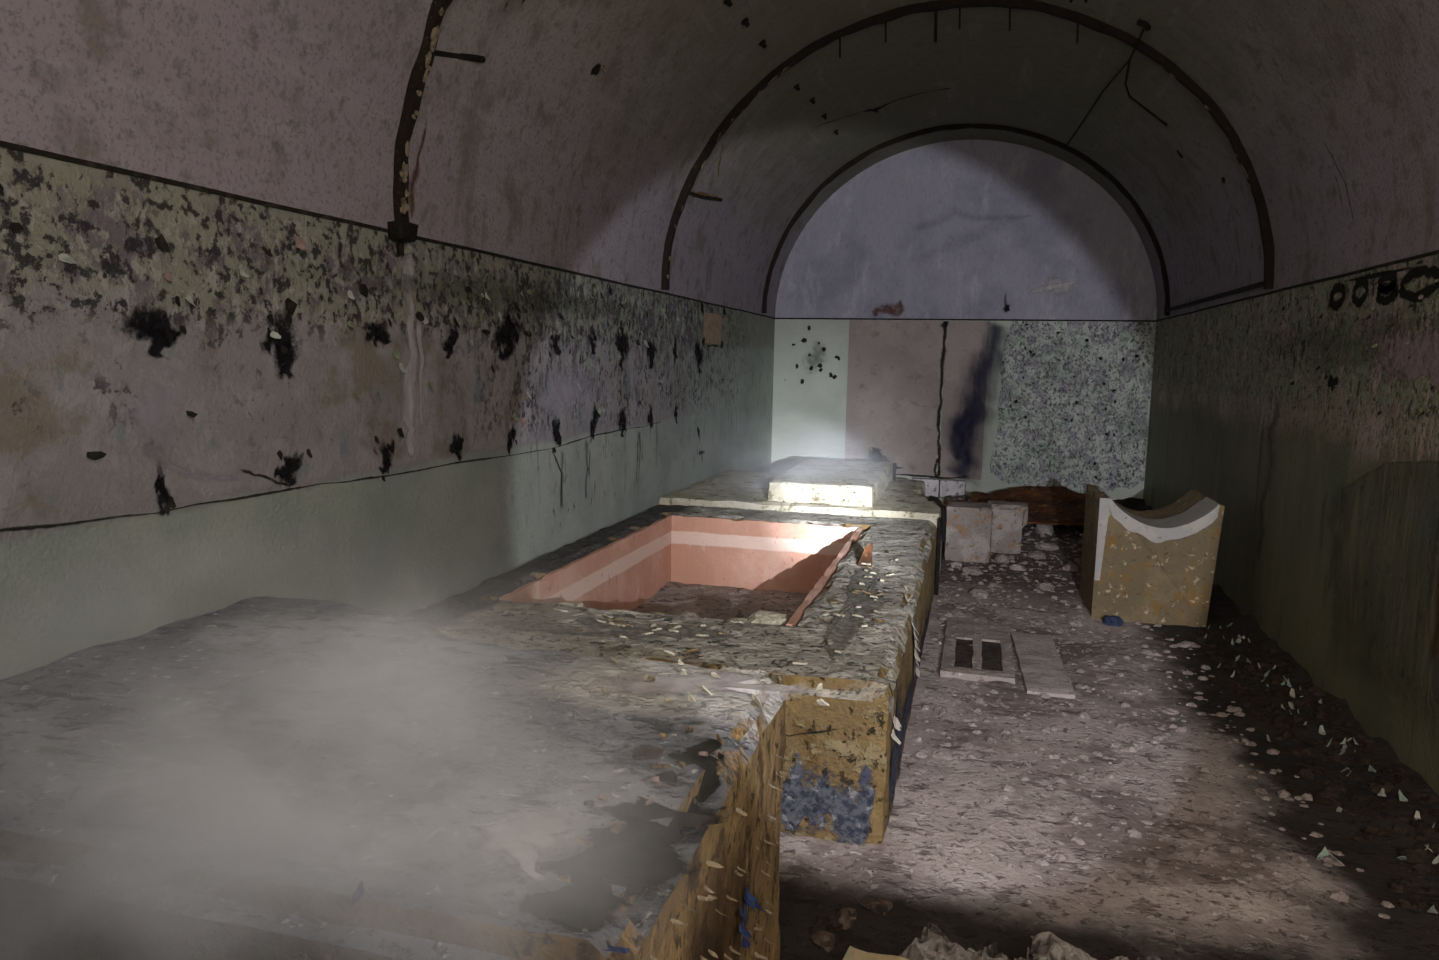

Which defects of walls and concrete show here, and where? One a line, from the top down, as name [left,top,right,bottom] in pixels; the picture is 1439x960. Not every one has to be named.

peeling [58,253,76,264]
peeling [154,233,170,253]
peeling [347,284,369,300]
peeling [267,298,298,339]
peeling [415,286,534,346]
water stain [375,334,391,345]
water stain [402,243,425,457]
peeling [87,451,107,460]
spalling [771,551,921,701]
spalling [891,699,902,745]